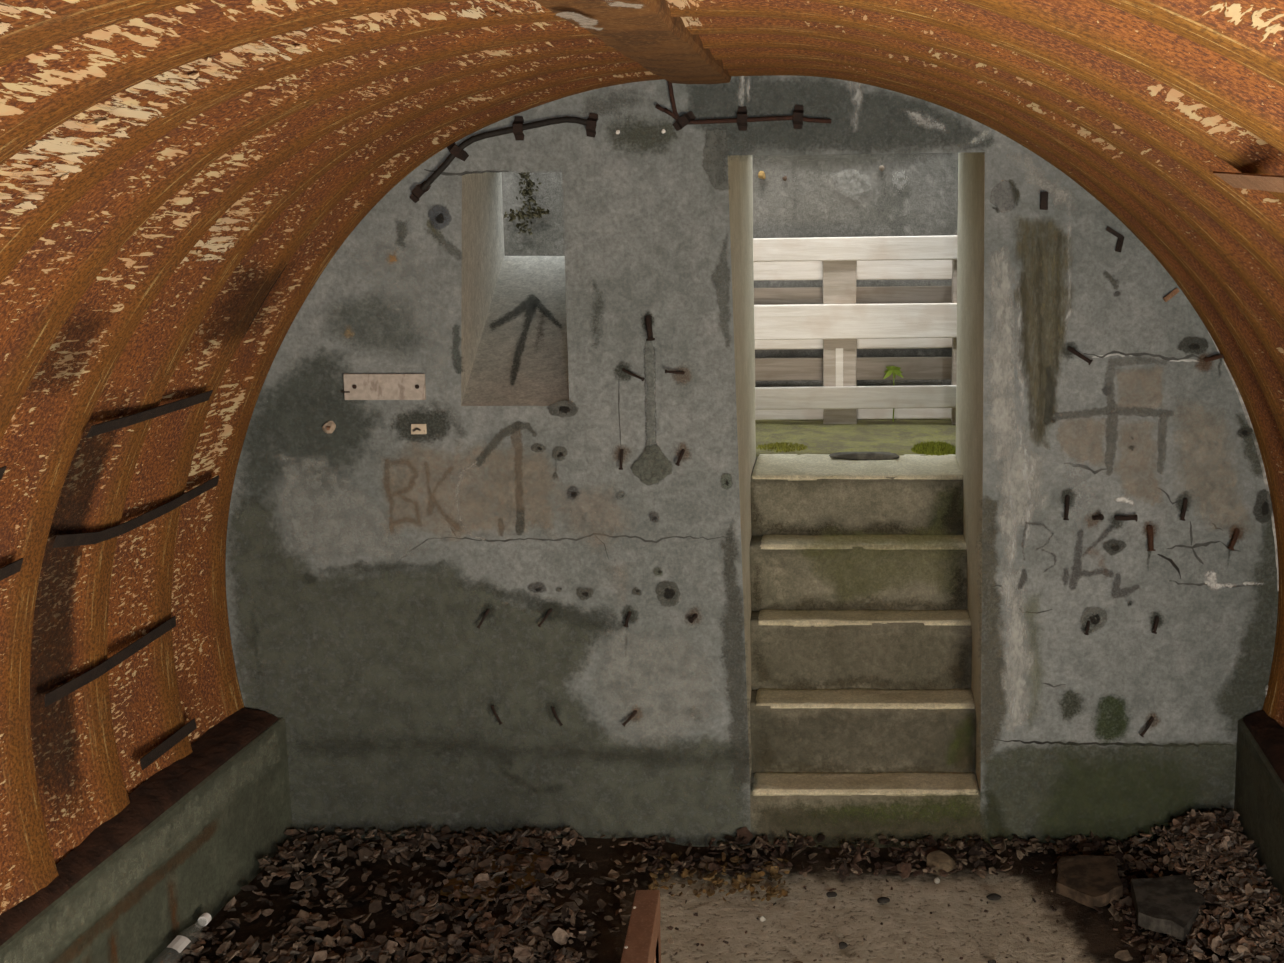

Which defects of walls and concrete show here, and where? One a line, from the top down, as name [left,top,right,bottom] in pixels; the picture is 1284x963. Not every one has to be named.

peeling [0,0,56,34]
peeling [450,0,545,19]
peeling [667,0,702,28]
peeling [0,26,323,225]
spalling [427,205,451,236]
peeling [180,217,254,264]
crack [1084,350,1216,362]
crack [1156,487,1261,588]
damp [4,221,1278,963]